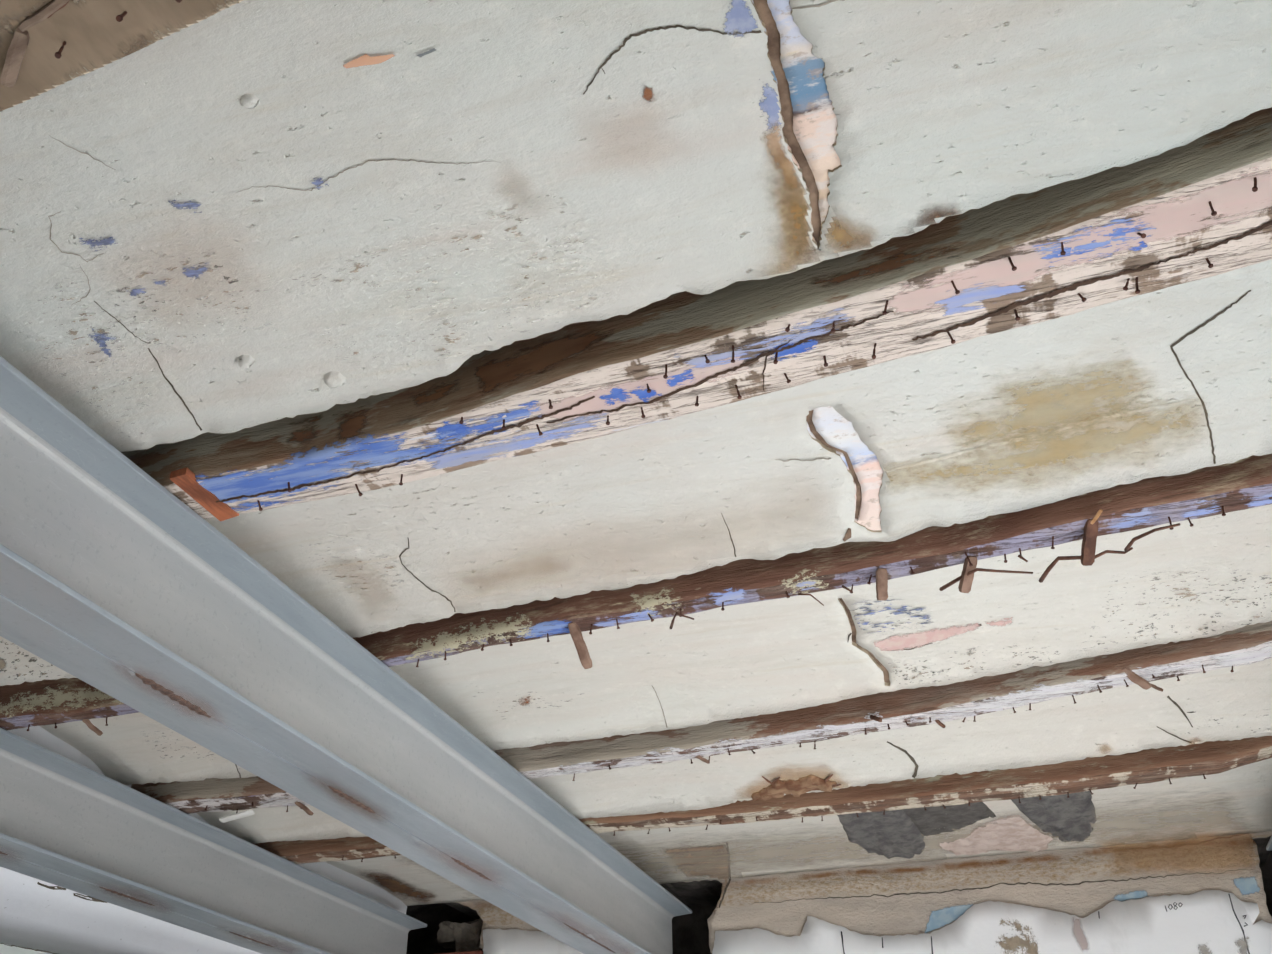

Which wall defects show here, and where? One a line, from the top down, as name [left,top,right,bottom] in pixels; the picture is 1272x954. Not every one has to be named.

crack [583,0,845,246]
crack [238,159,497,192]
water stain [780,177,809,270]
water stain [828,217,869,252]
crack [48,211,202,431]
crack [1170,290,1251,464]
crack [399,538,456,612]
flaking render [367,873,435,902]
flaking render [457,899,543,949]
flaking render [666,815,1272,954]